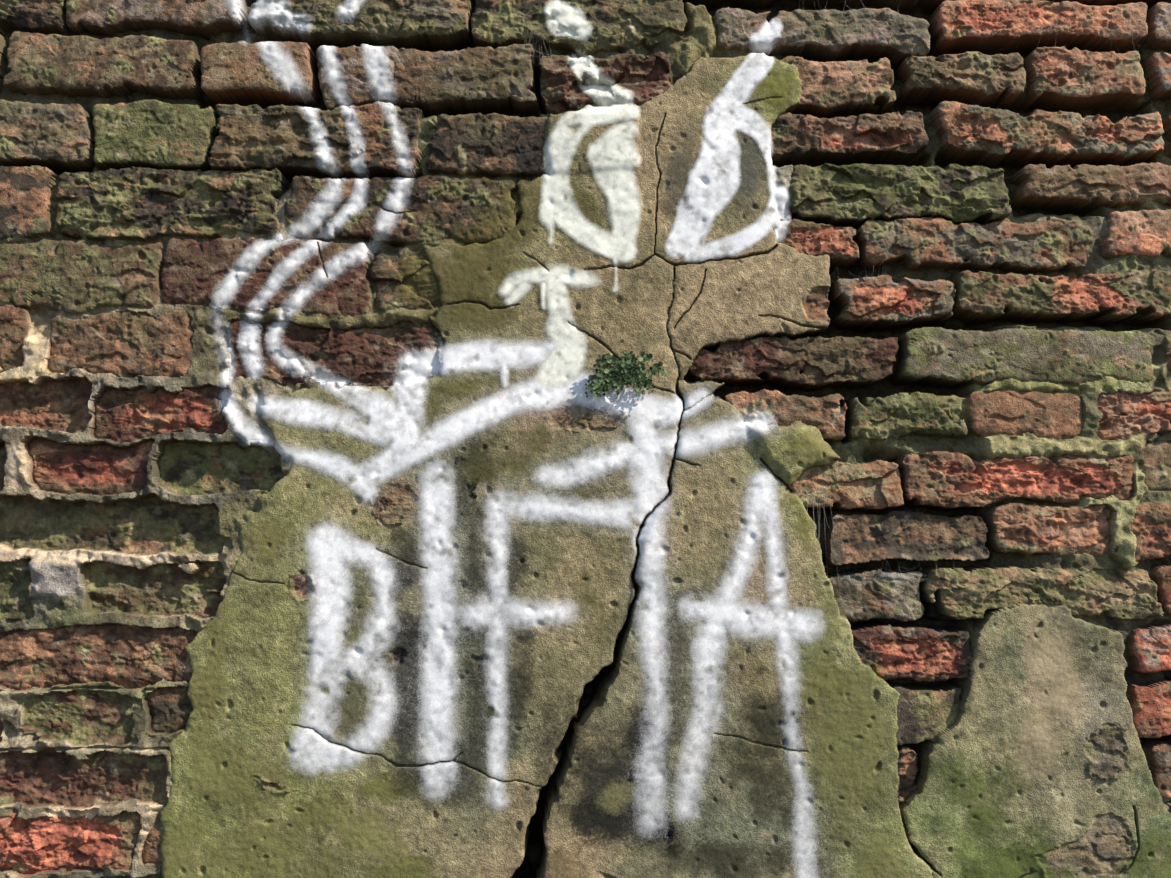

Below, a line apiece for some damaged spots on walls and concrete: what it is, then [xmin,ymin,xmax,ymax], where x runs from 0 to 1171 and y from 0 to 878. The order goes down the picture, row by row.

crack [759,315,827,336]
spalling [801,285,830,324]
spalling [851,284,934,318]
spalling [1045,276,1137,327]
spalling [113,391,228,434]
crack [291,114,779,878]
crack [760,458,794,493]
spalling [928,457,1125,552]
spalling [869,632,972,680]
crack [714,733,809,753]
spalling [1084,723,1131,786]
spalling [0,819,128,870]